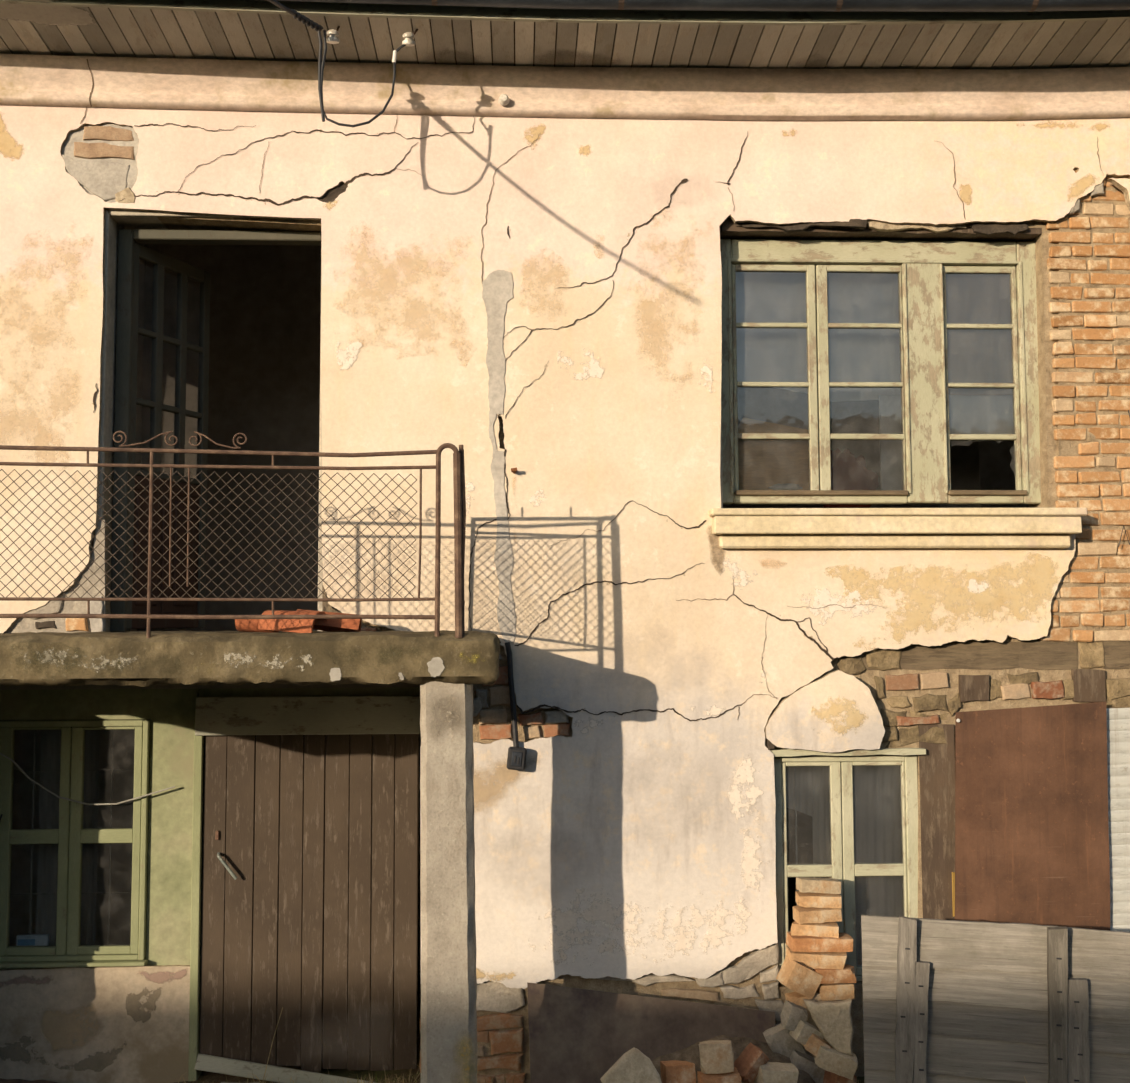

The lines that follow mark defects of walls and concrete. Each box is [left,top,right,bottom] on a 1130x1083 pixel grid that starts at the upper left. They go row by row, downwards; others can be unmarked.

flaking render [62,123,139,203]
crack [120,116,475,206]
crack [481,135,539,281]
crack [721,133,748,211]
crack [937,141,965,218]
crack [487,182,684,361]
flaking render [802,169,1130,642]
crack [468,449,510,631]
crack [551,501,706,546]
crack [500,563,882,721]
flaking render [479,666,570,740]